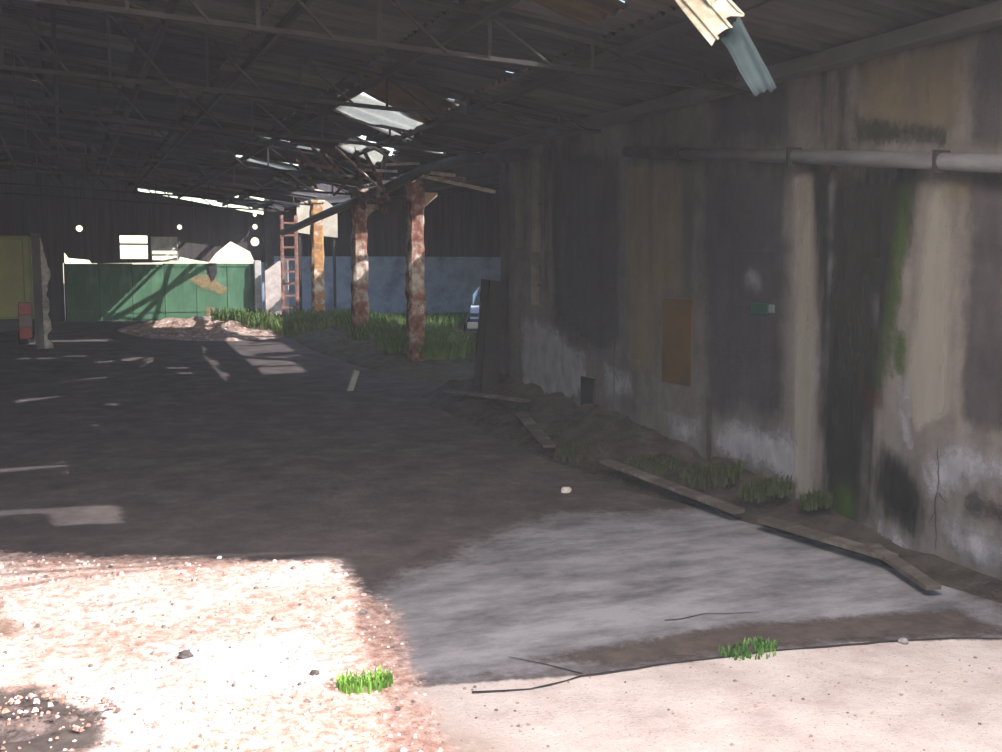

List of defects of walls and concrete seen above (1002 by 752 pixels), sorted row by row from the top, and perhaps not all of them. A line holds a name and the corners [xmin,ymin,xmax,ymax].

damp [795,165,950,532]